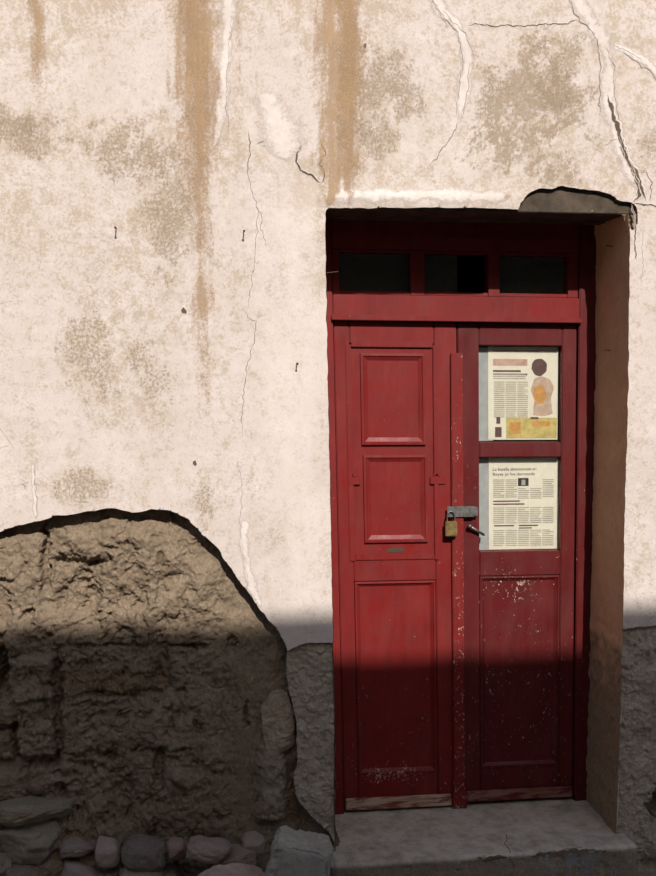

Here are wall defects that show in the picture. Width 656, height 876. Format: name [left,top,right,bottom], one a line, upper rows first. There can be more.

leakage [0,0,221,325]
crack [213,0,266,436]
crack [295,140,326,184]
leakage [312,0,424,205]
crack [429,0,656,289]
spalling [534,186,638,233]
crack [237,461,262,607]
spalling [0,508,340,876]